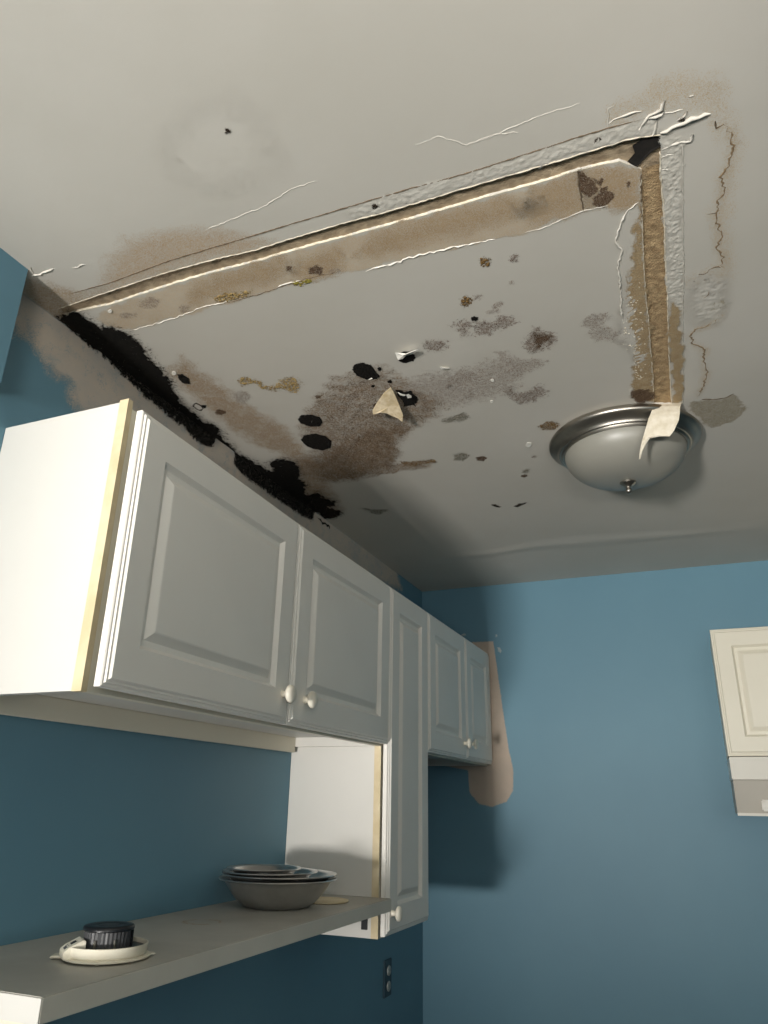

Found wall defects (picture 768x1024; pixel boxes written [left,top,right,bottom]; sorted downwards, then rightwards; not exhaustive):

peeling [13,294,402,589]
leakage [23,224,558,529]
crack [30,103,639,295]
spalling [372,387,418,421]
peeling [98,100,711,404]
peeling [445,634,514,807]